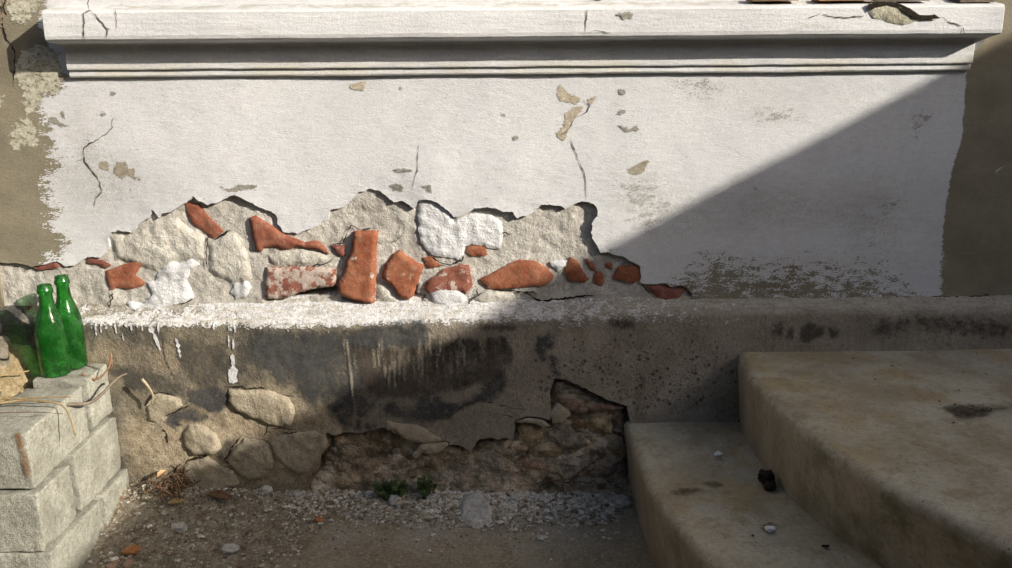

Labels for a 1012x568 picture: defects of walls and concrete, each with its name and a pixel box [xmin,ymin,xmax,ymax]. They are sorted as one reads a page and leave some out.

crack [83,0,117,42]
flaking render [866,1,940,25]
peeling [7,44,62,151]
crack [76,119,113,205]
crack [559,100,590,192]
flaking render [0,168,690,309]
water stain [100,323,164,340]
flaking render [145,393,183,429]
water stain [107,326,238,429]
water stain [248,320,515,432]
flaking render [182,379,632,497]
water stain [772,322,839,342]